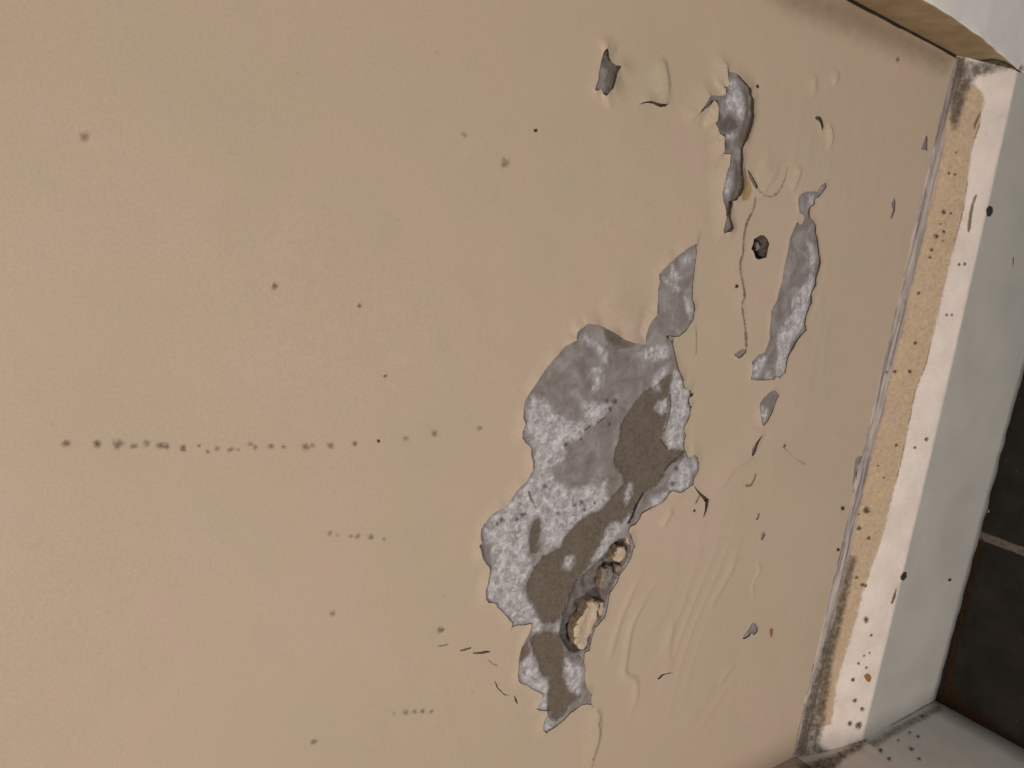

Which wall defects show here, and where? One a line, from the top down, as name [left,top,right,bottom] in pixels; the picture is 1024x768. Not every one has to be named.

peeling [591,43,625,101]
peeling [694,59,756,239]
peeling [472,238,702,739]
peeling [732,179,828,459]
leakage [818,82,983,728]